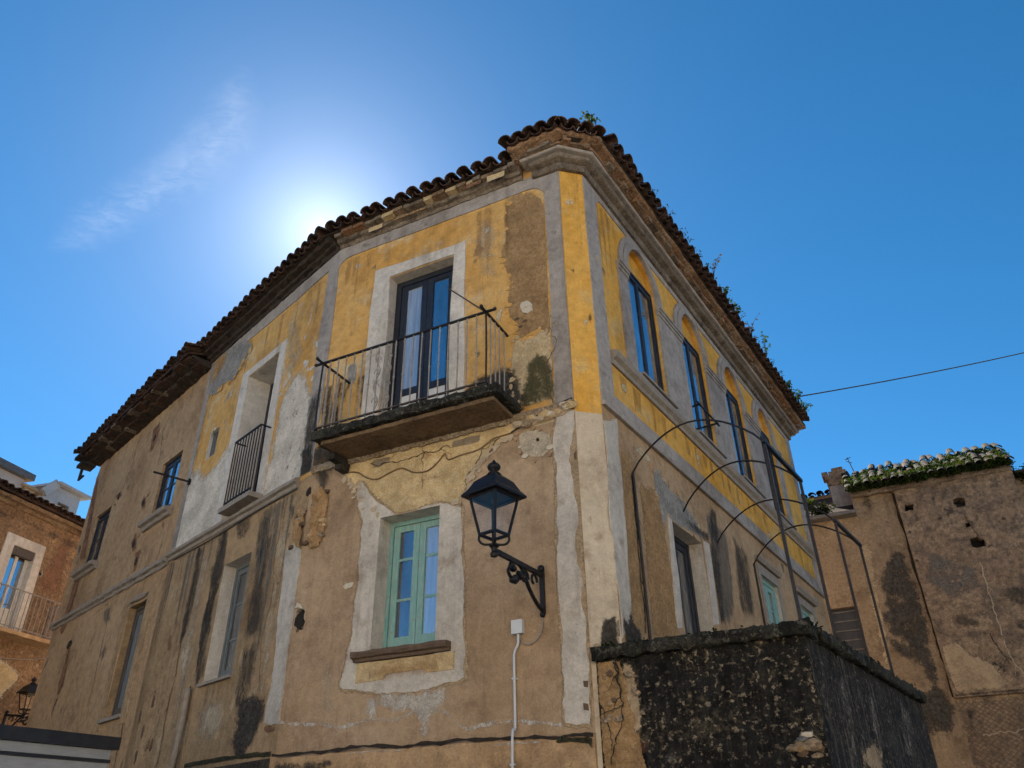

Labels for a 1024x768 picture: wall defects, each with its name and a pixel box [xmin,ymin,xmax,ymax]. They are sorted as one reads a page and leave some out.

peeling [341,192,578,518]
peeling [263,360,314,496]
crack [370,445,450,488]
crack [461,438,502,507]
water stain [159,495,331,768]
water stain [689,508,754,623]
water stain [881,552,956,735]